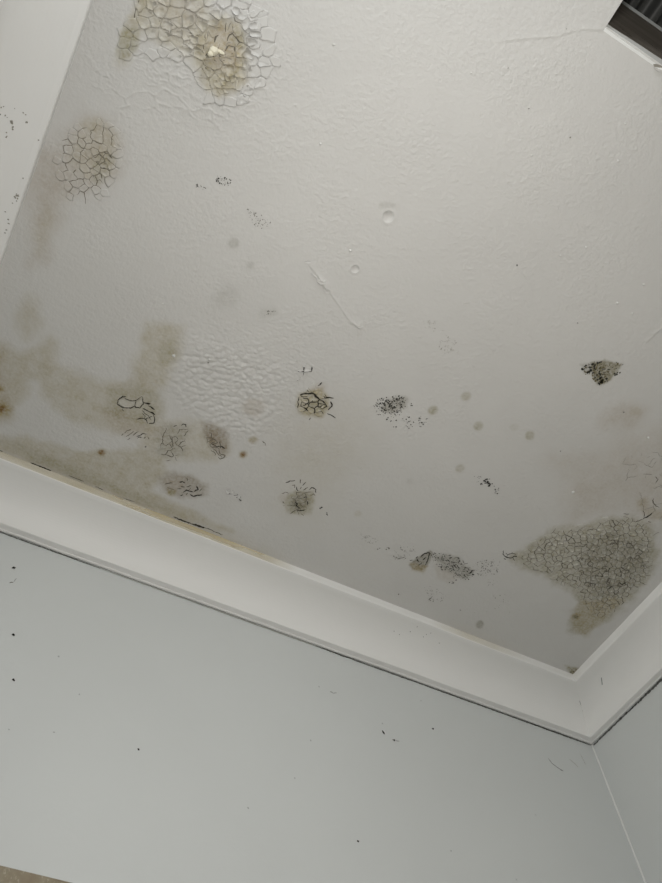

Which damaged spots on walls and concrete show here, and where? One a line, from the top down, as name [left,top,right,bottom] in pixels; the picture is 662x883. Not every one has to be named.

peeling [71,0,313,162]
damp [0,95,239,545]
crack [117,396,226,461]
crack [166,479,202,497]
damp [236,368,440,545]
damp [364,394,662,642]
crack [503,452,662,618]
damp [578,357,625,388]